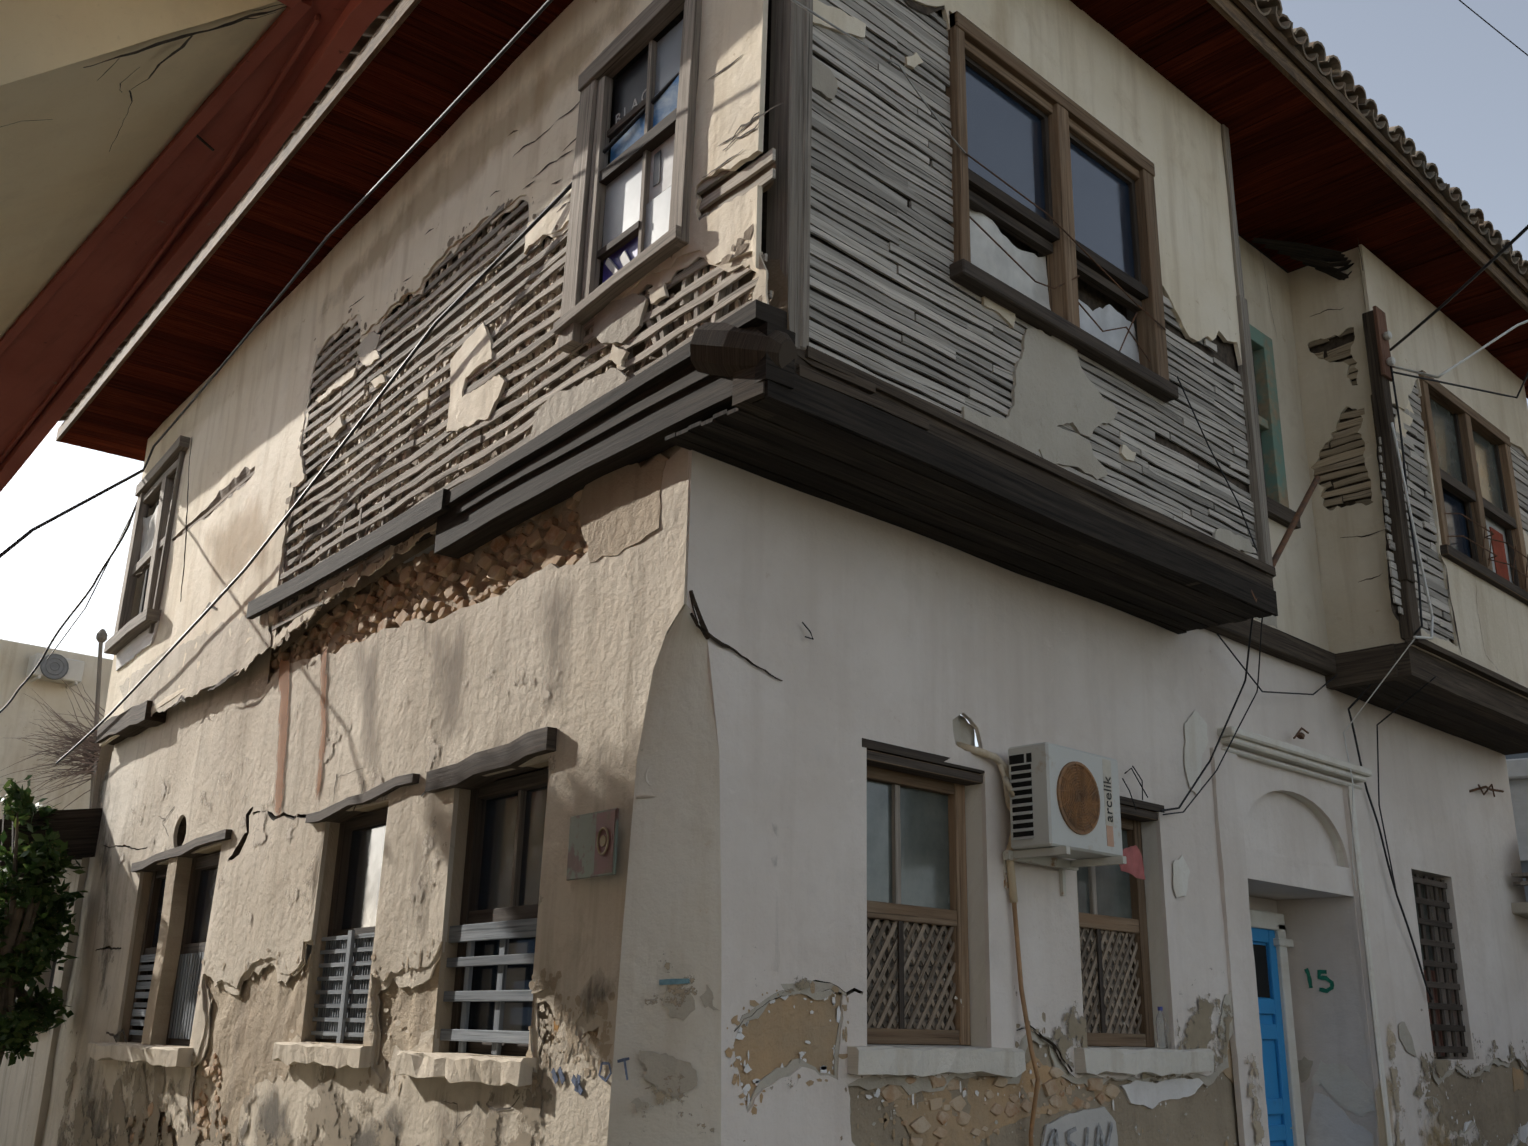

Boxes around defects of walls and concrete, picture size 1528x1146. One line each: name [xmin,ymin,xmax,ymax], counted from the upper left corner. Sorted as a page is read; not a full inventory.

crack [83,4,288,152]
spalling [697,148,776,221]
spalling [1308,327,1358,386]
spalling [116,195,790,716]
spalling [1311,381,1455,643]
crack [689,590,783,681]
rust [274,658,290,814]
rust [316,649,327,796]
crack [229,768,365,860]
leakage [258,1094,285,1144]
spalling [645,960,1264,1146]
spalling [1388,1021,1528,1146]